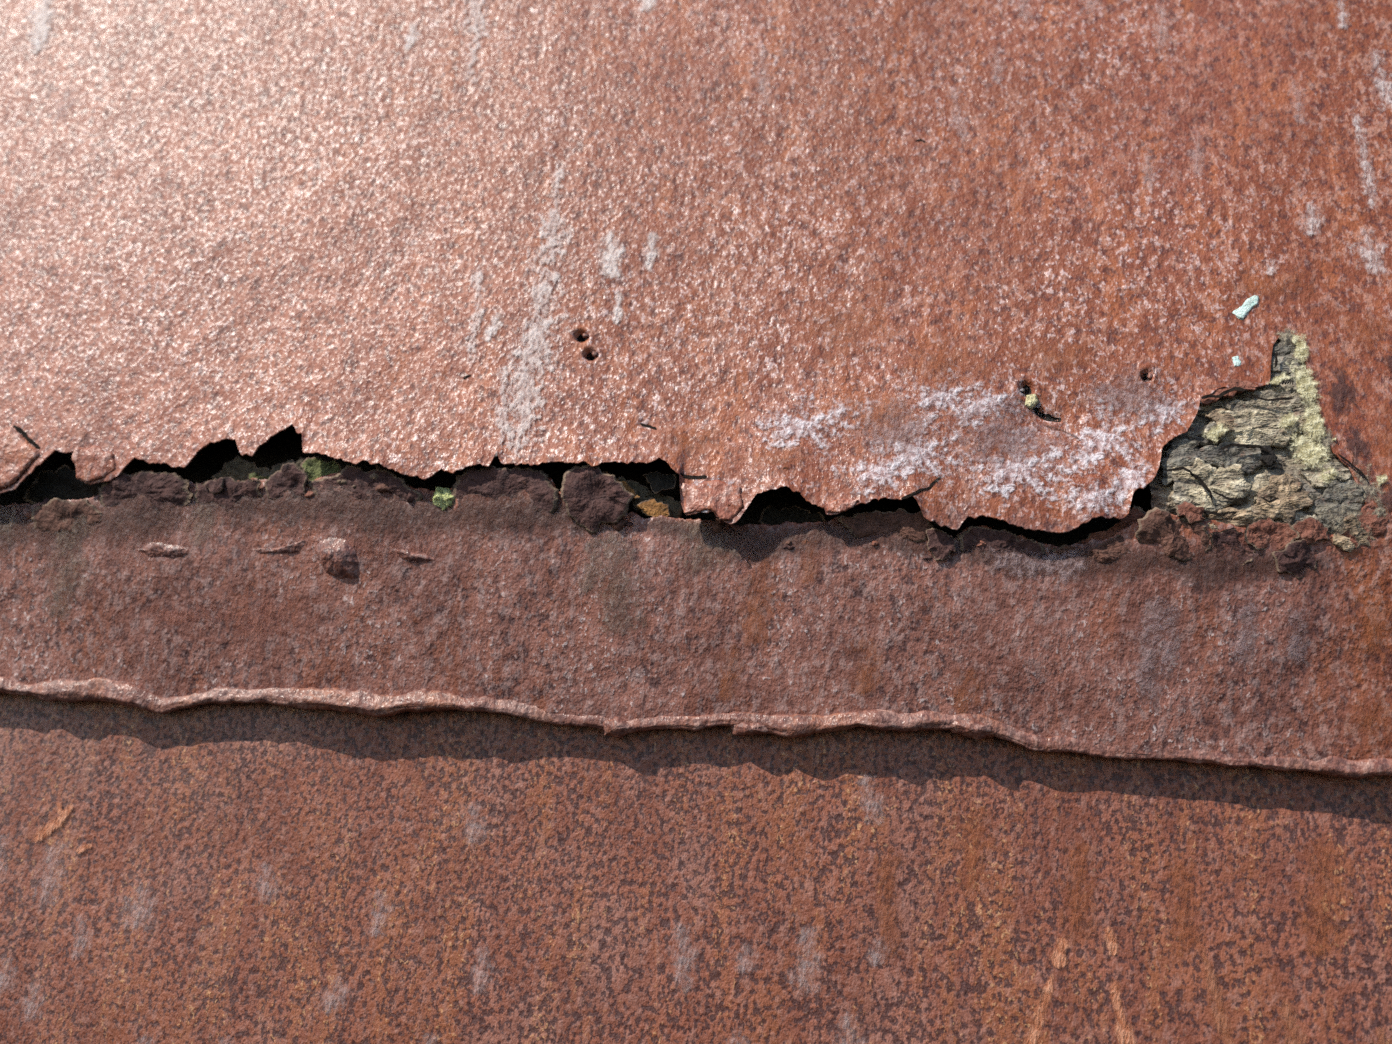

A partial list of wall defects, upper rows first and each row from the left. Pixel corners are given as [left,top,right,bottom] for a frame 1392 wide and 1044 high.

efflorescence [757,368,1185,512]
spalling [1149,329,1389,553]